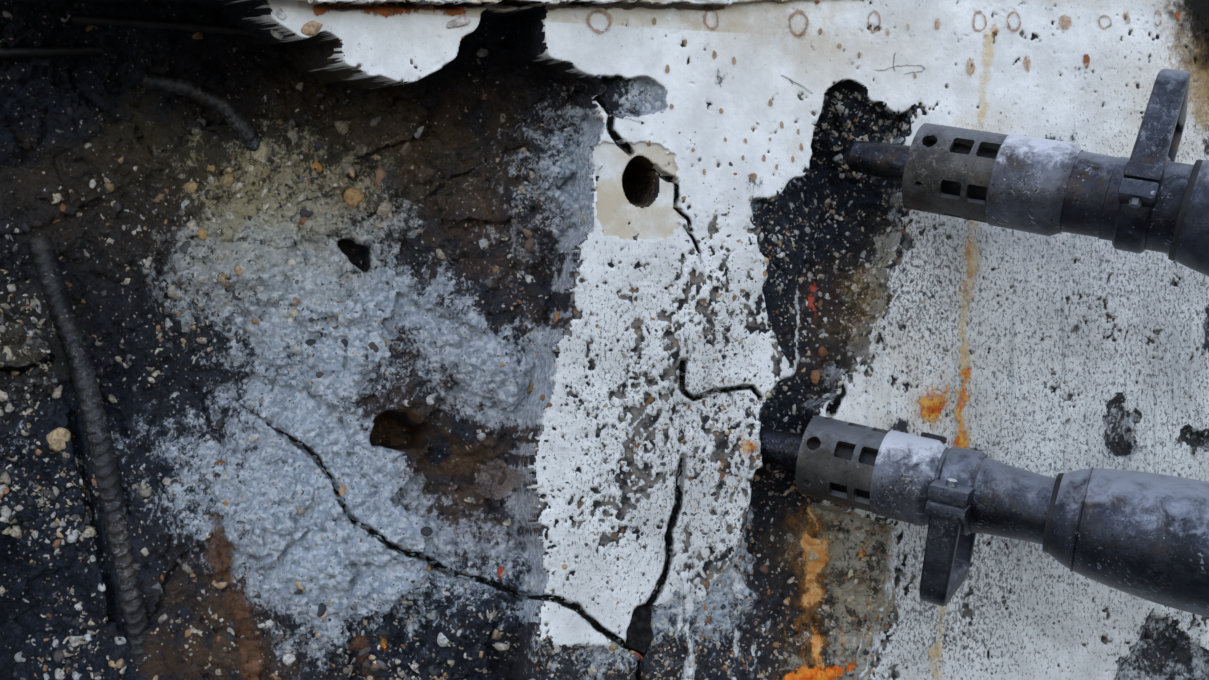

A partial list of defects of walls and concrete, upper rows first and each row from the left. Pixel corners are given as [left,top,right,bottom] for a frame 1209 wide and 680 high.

rust [313,0,466,18]
rust [967,11,1021,76]
leakage [1169,0,1209,130]
crack [565,92,702,262]
spalling [0,0,919,680]
crack [679,360,762,406]
rust [918,317,971,449]
spalling [1102,392,1144,460]
rust [206,513,267,680]
crack [230,398,684,680]
rust [783,505,855,680]
spalling [1114,608,1209,680]